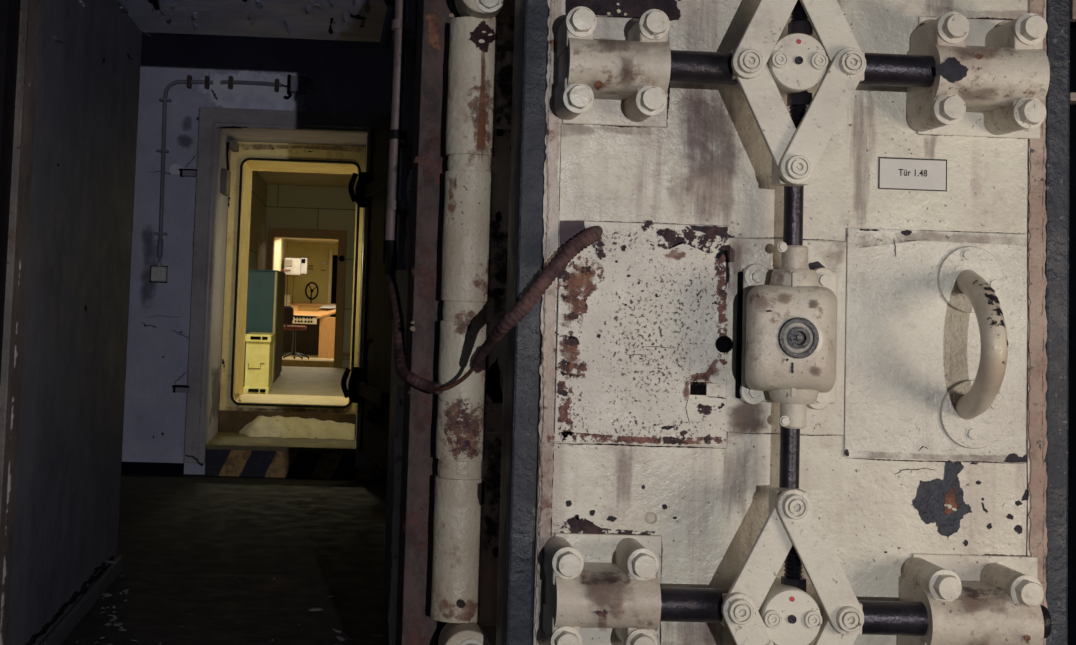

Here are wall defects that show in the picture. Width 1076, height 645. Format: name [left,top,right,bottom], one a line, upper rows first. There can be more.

rust [565,0,681,21]
peeling [193,68,313,111]
rust [468,52,495,155]
rust [554,256,605,378]
rust [683,359,718,398]
rust [441,399,484,460]
peeling [912,460,992,546]
peeling [1006,489,1029,534]